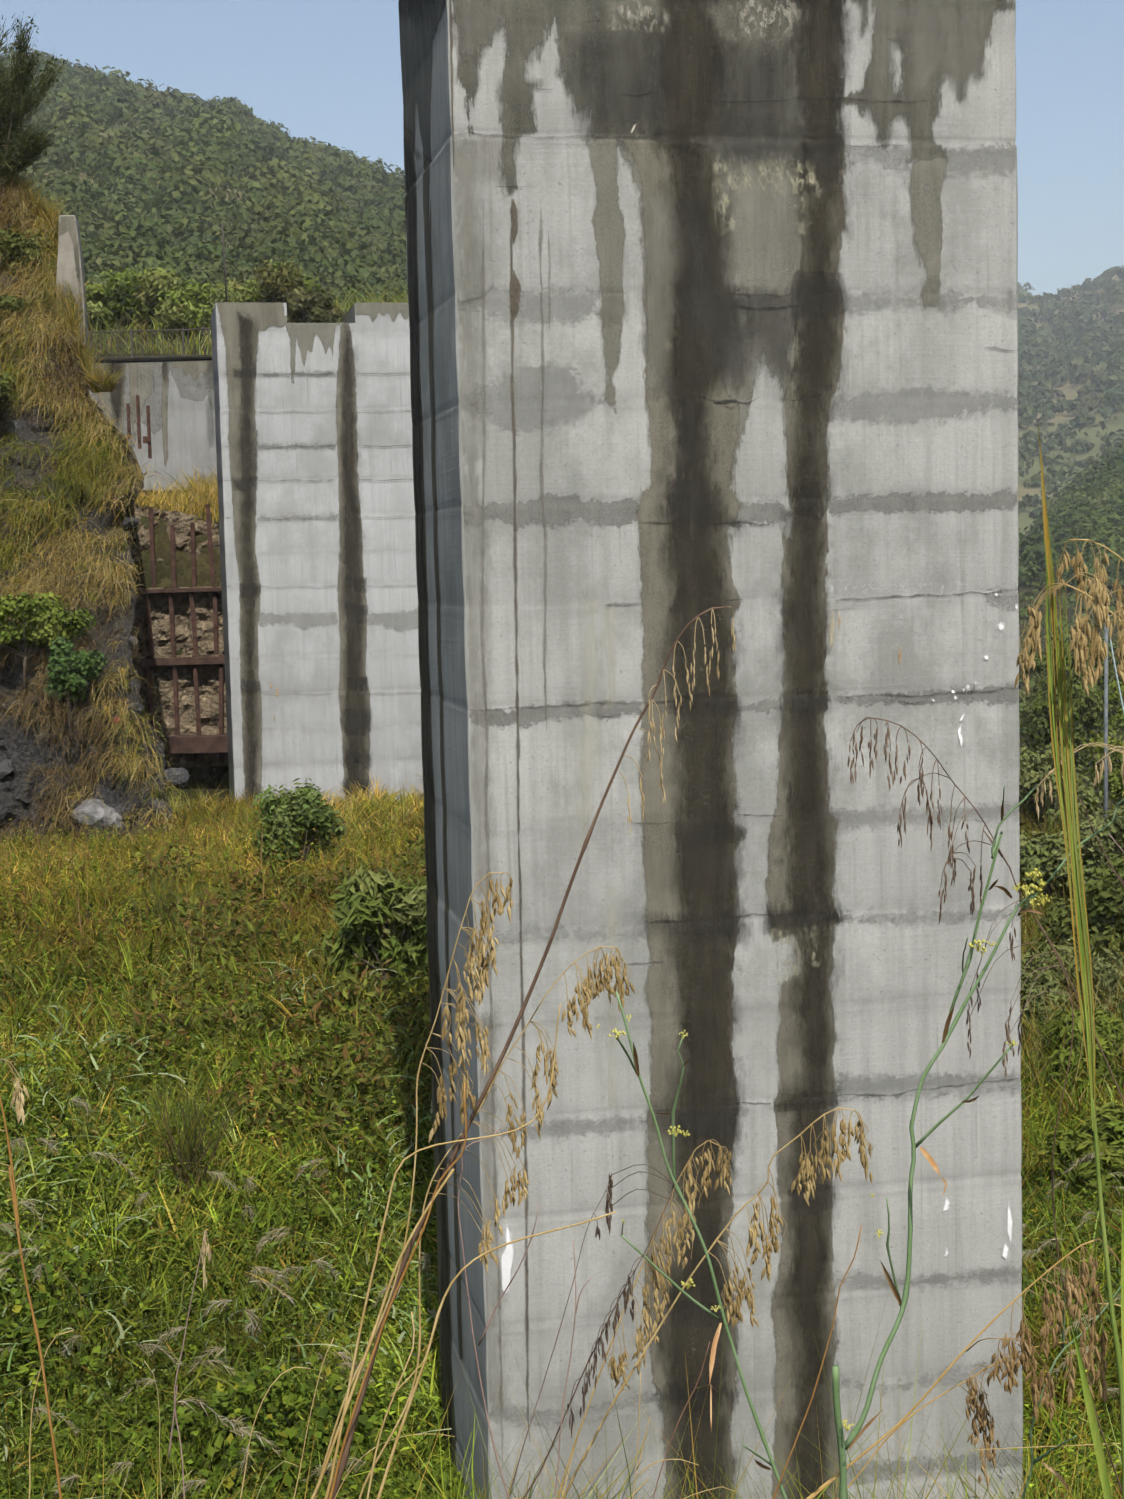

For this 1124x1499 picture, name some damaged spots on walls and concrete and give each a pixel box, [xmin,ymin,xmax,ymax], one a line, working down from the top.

water stain [89,361,214,466]
water stain [217,0,1020,1499]